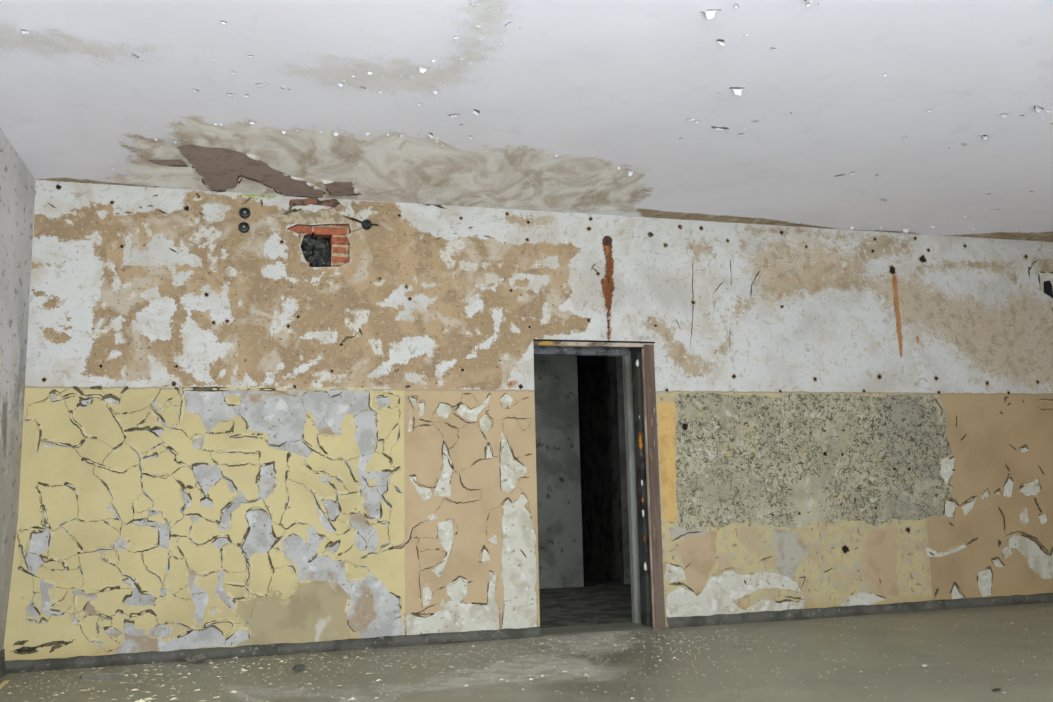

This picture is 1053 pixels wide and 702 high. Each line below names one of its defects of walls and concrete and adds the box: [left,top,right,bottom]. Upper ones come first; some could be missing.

peeling [702,3,739,19]
leakage [39,114,1053,397]
corrosion [600,243,616,341]
corrosion [891,275,903,357]
peeling [16,175,592,653]